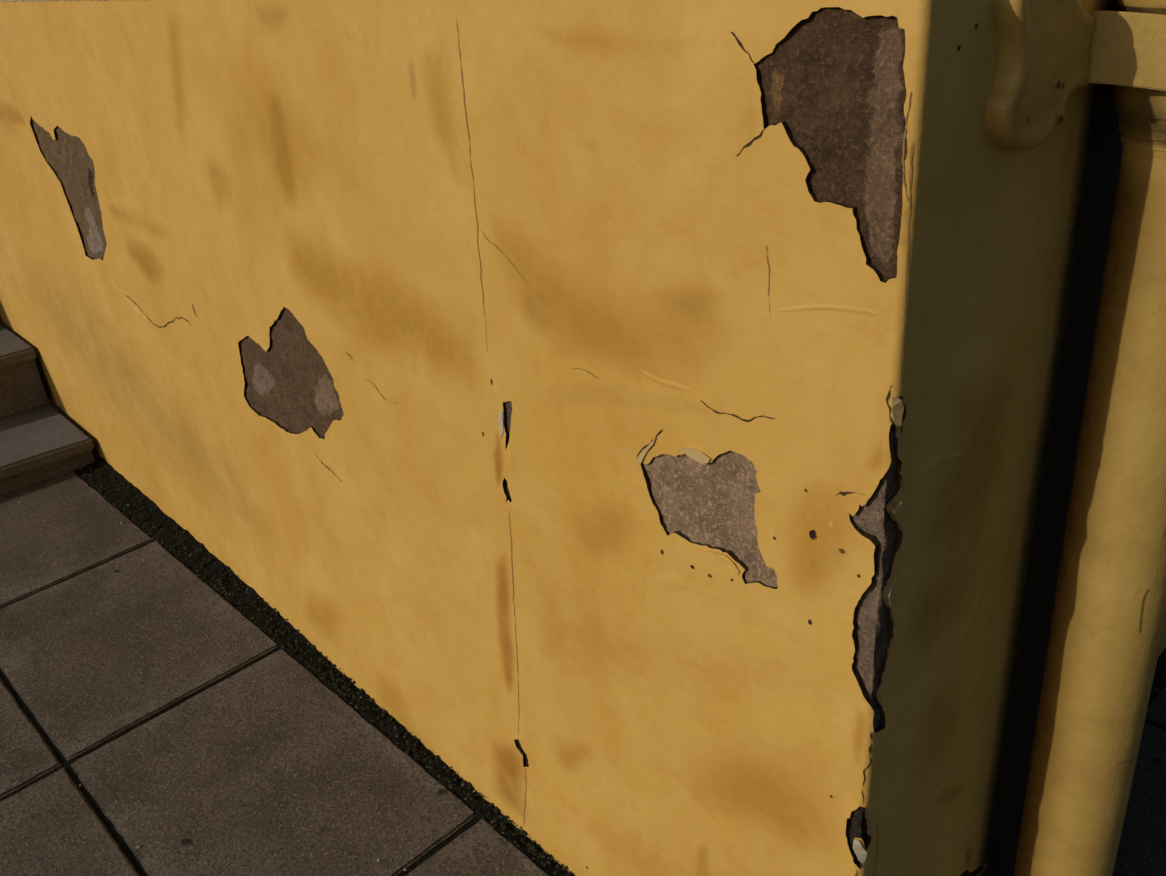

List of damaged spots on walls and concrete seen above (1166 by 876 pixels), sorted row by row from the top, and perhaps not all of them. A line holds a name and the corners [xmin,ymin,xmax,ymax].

flaking render [32,118,107,259]
flaking render [757,7,907,281]
crack [127,296,197,328]
flaking render [241,308,344,437]
flaking render [498,401,512,443]
crack [701,401,774,422]
flaking render [636,438,778,587]
flaking render [853,396,904,728]
flaking render [849,806,867,863]